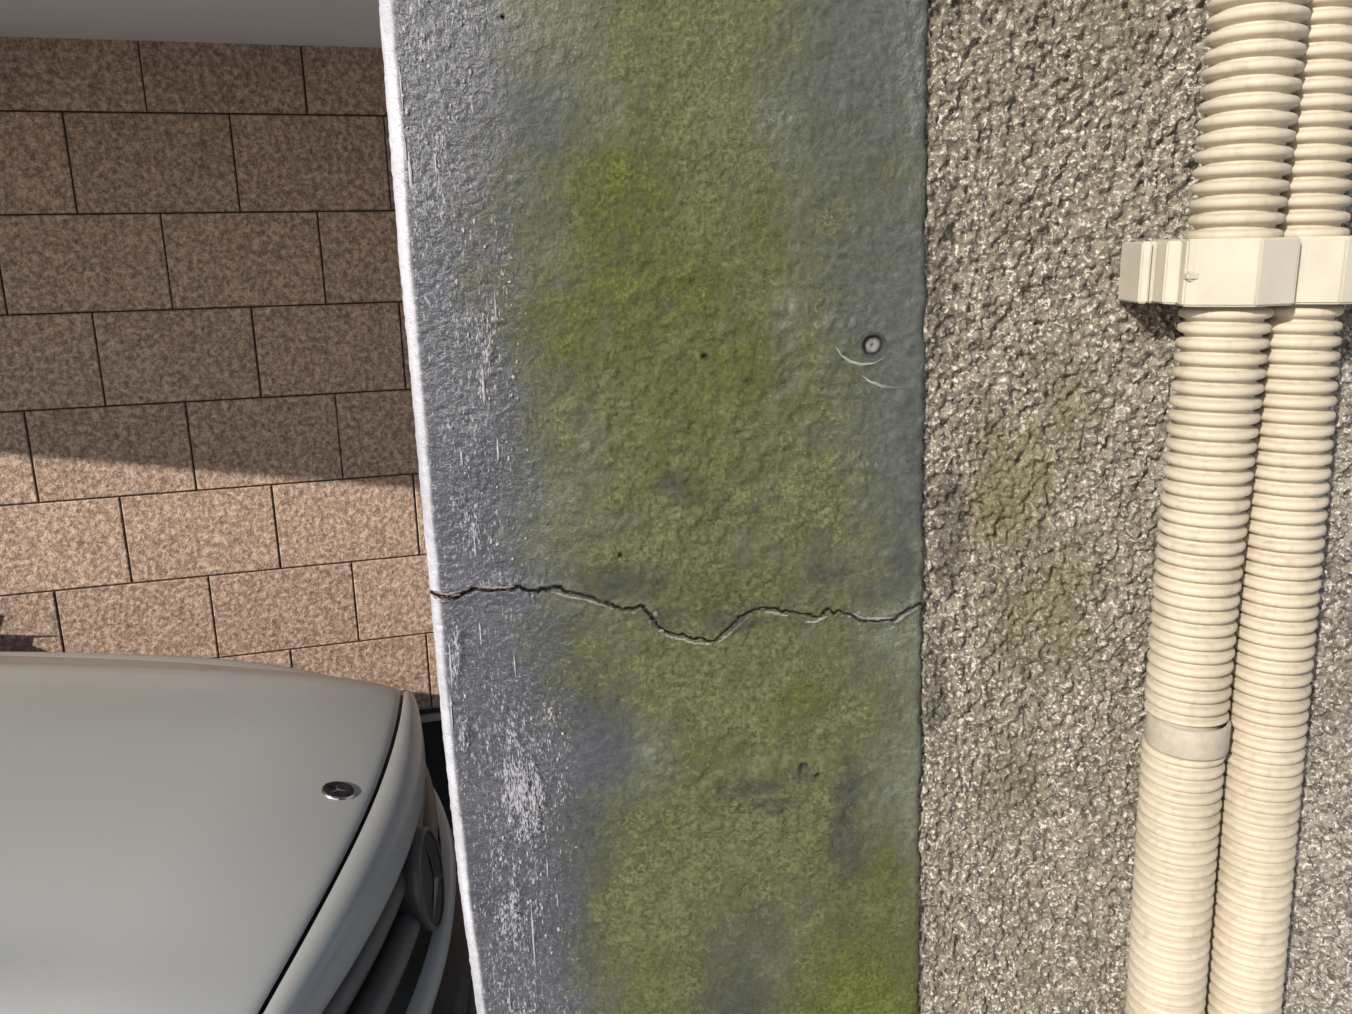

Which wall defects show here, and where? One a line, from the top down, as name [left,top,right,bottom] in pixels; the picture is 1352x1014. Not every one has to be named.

crack [430,585,921,645]